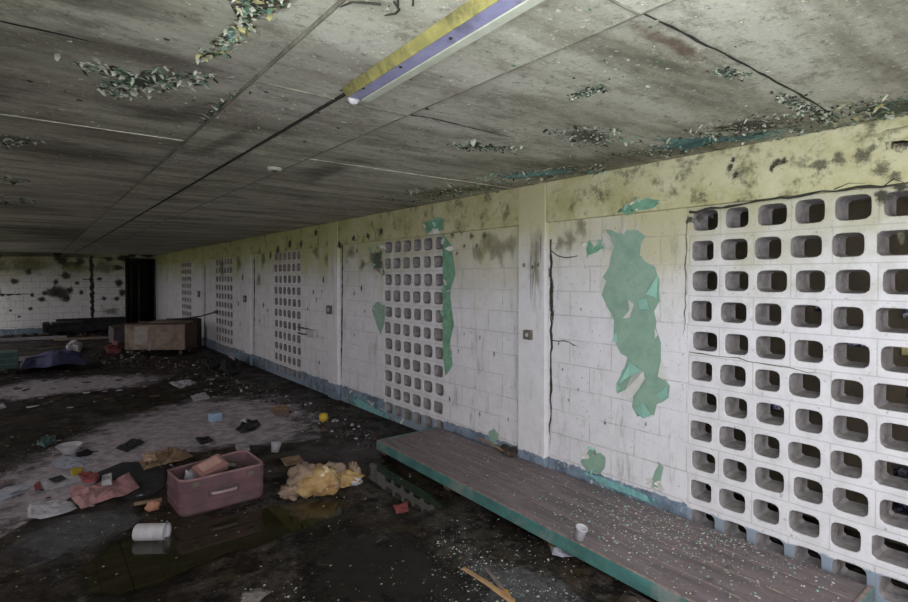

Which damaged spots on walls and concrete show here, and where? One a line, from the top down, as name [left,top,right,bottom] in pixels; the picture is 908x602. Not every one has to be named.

crack [643,13,850,126]
water stain [809,153,845,171]
water stain [855,144,875,160]
water stain [874,165,908,204]
peeling [356,245,386,279]
peeling [364,302,385,335]
peeling [423,217,459,376]
crack [549,239,577,439]
peeling [582,198,670,426]
crack [683,178,908,376]